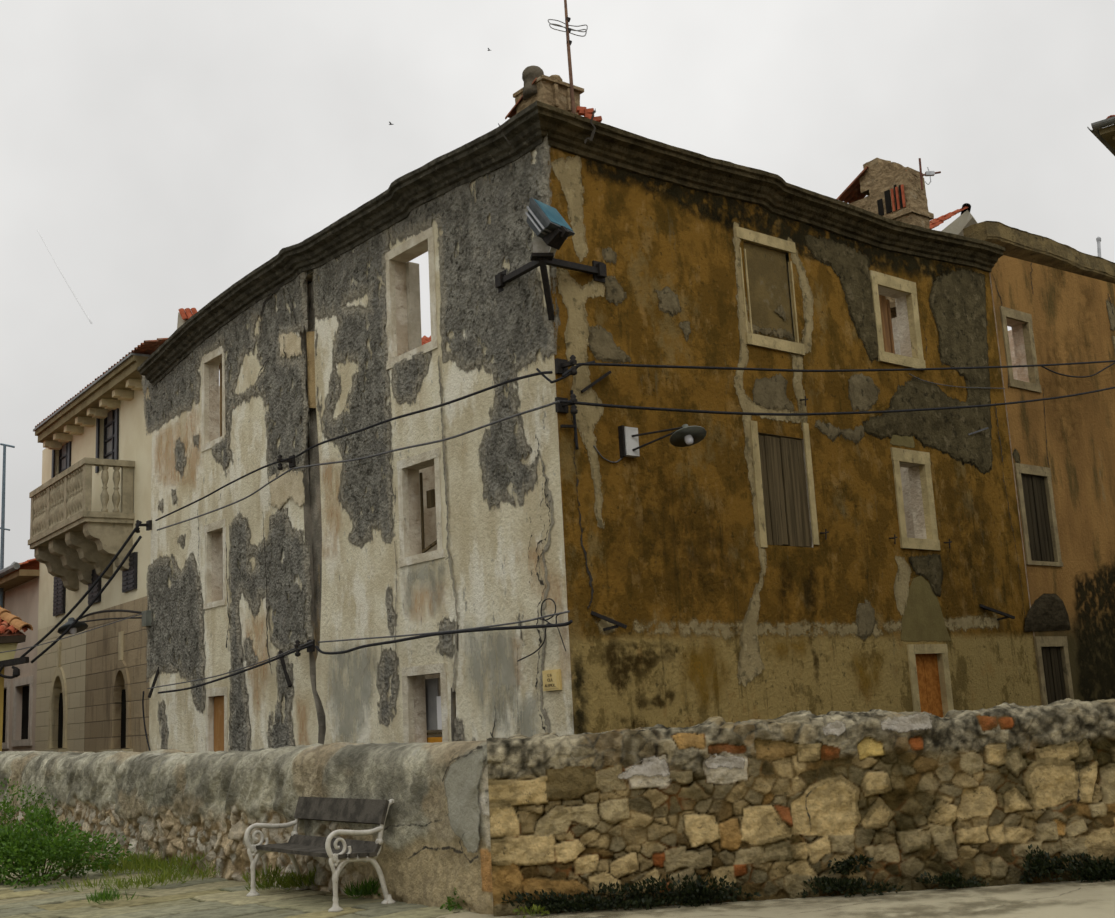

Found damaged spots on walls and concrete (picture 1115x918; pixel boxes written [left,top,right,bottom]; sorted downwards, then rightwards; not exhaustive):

peeling [141,133,561,549]
spalling [588,324,631,363]
spalling [752,373,794,410]
spalling [803,235,878,362]
spalling [815,268,993,474]
peeling [158,700,169,750]
peeling [146,534,206,713]
peeling [228,506,313,751]
peeling [376,587,400,727]
crack [438,356,594,782]
water stain [636,691,674,708]
spalling [909,553,944,597]